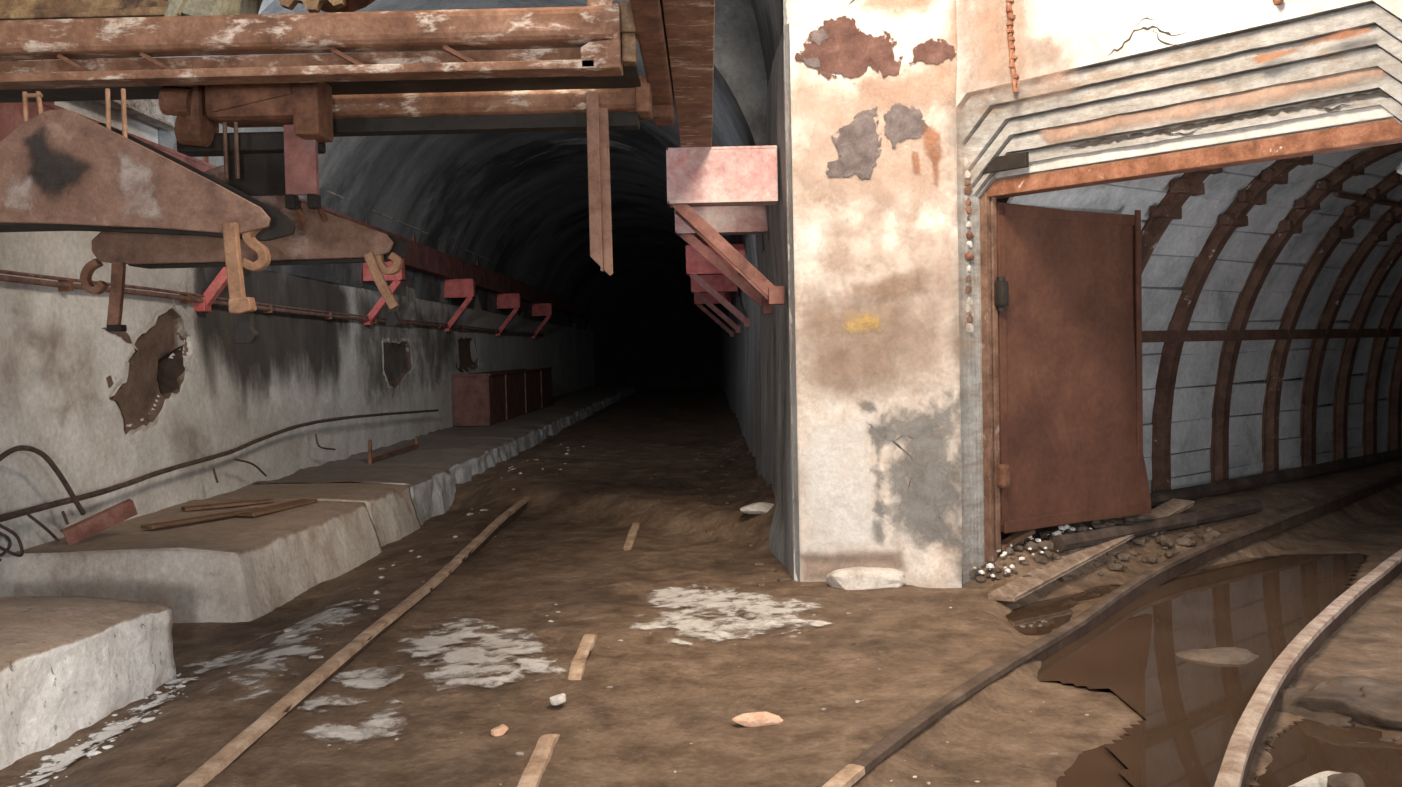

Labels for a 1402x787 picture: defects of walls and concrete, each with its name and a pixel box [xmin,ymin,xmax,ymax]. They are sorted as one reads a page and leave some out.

rust [1003,0,1023,93]
crack [1109,17,1188,55]
water stain [196,156,224,166]
water stain [219,123,283,133]
water stain [299,136,367,200]
peeling [783,0,956,379]
water stain [794,0,1064,250]
flaking render [102,304,192,435]
water stain [180,265,452,422]
flaking render [382,339,412,389]
water stain [803,251,968,578]
water stain [632,587,832,645]